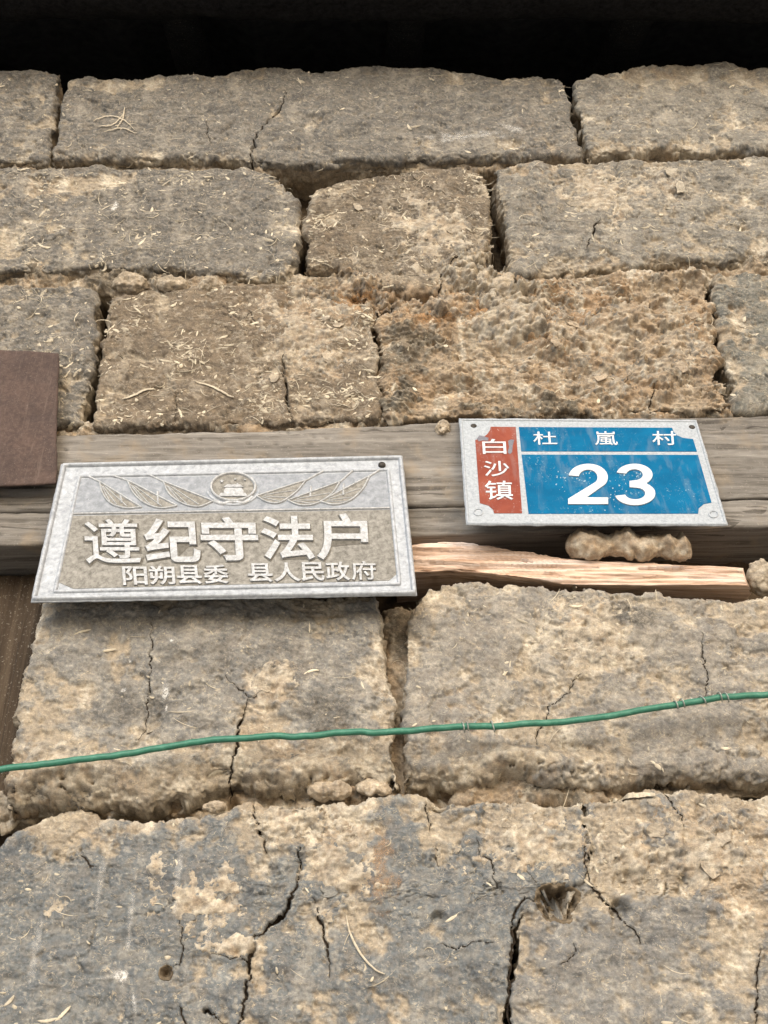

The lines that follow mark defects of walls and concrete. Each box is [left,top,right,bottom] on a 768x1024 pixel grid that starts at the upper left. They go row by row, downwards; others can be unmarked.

crack [250,93,287,170]
crack [138,625,156,740]
crack [225,675,267,853]
crack [535,674,580,744]
crack [701,634,709,696]
crack [179,847,330,1024]
crack [583,827,641,943]